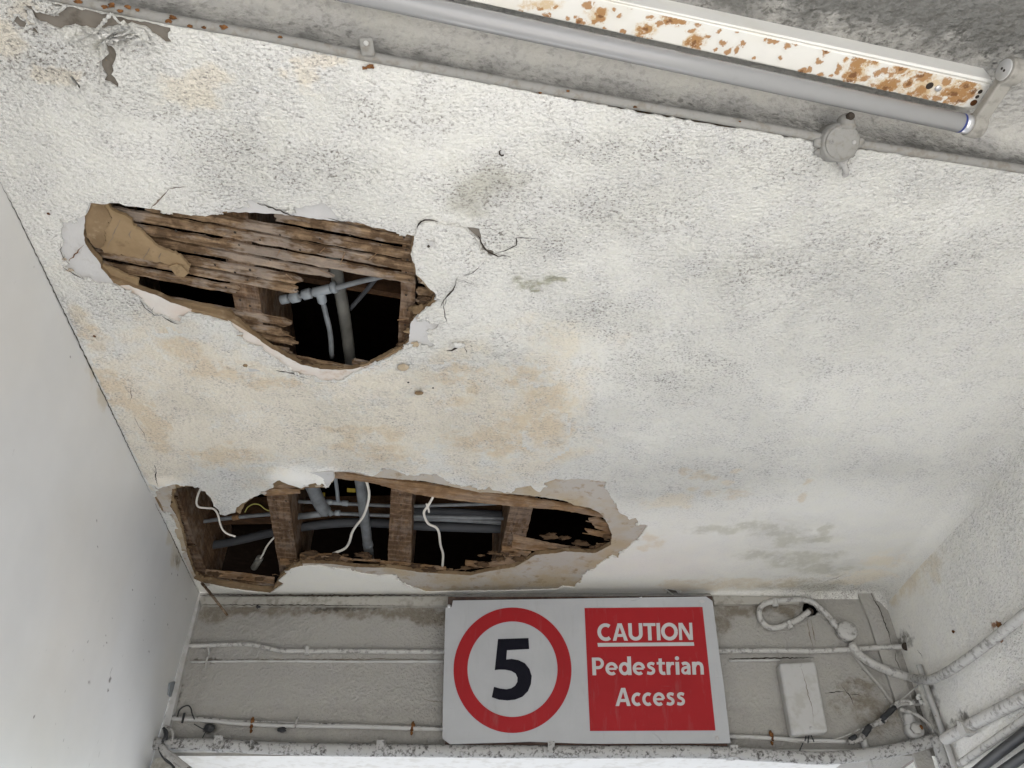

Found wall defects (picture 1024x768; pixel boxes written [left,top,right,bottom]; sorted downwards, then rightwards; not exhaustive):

peeling [14,4,171,90]
spalling [61,199,445,383]
leakage [42,241,640,515]
crack [438,236,529,353]
spalling [150,468,647,591]
leakage [596,466,955,645]